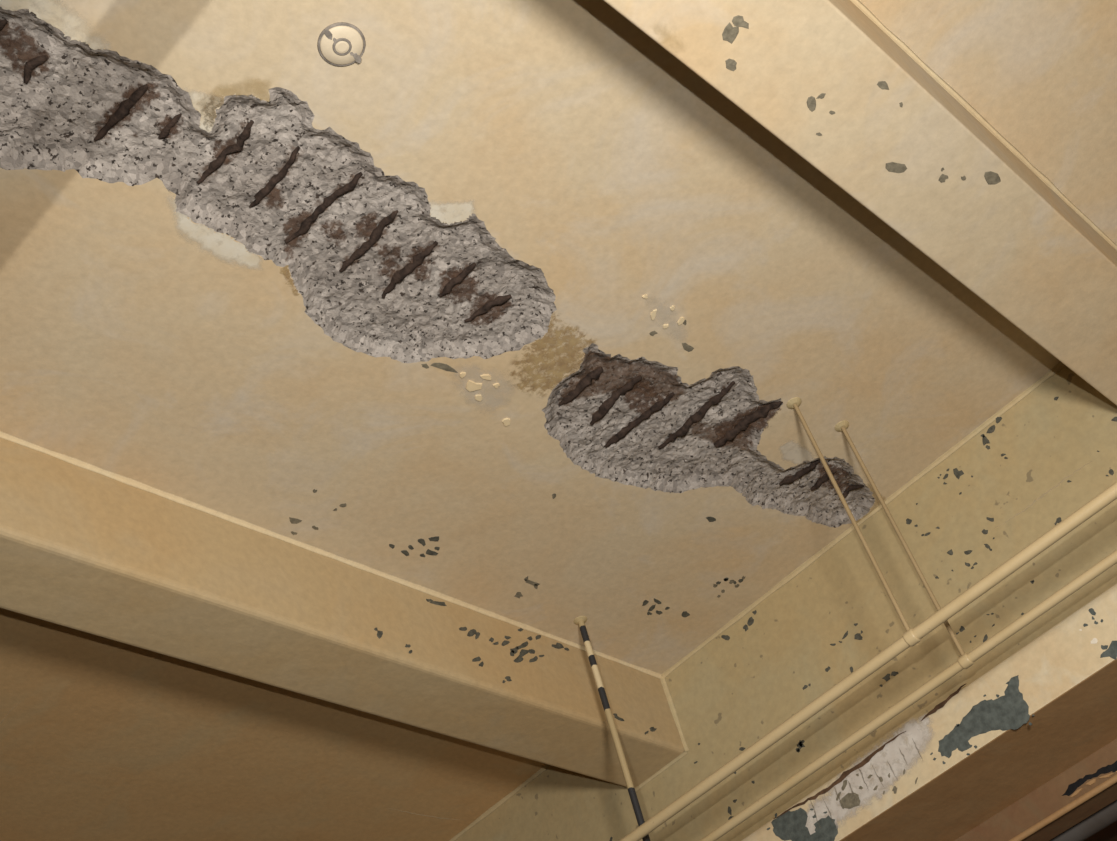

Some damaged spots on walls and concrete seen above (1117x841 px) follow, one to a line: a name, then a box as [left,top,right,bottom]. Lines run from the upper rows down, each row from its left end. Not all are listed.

spalling [0,7,557,373]
spalling [542,343,875,528]
peeling [514,576,540,599]
peeling [930,675,1035,764]
peeling [767,769,918,841]
peeling [1062,761,1117,796]